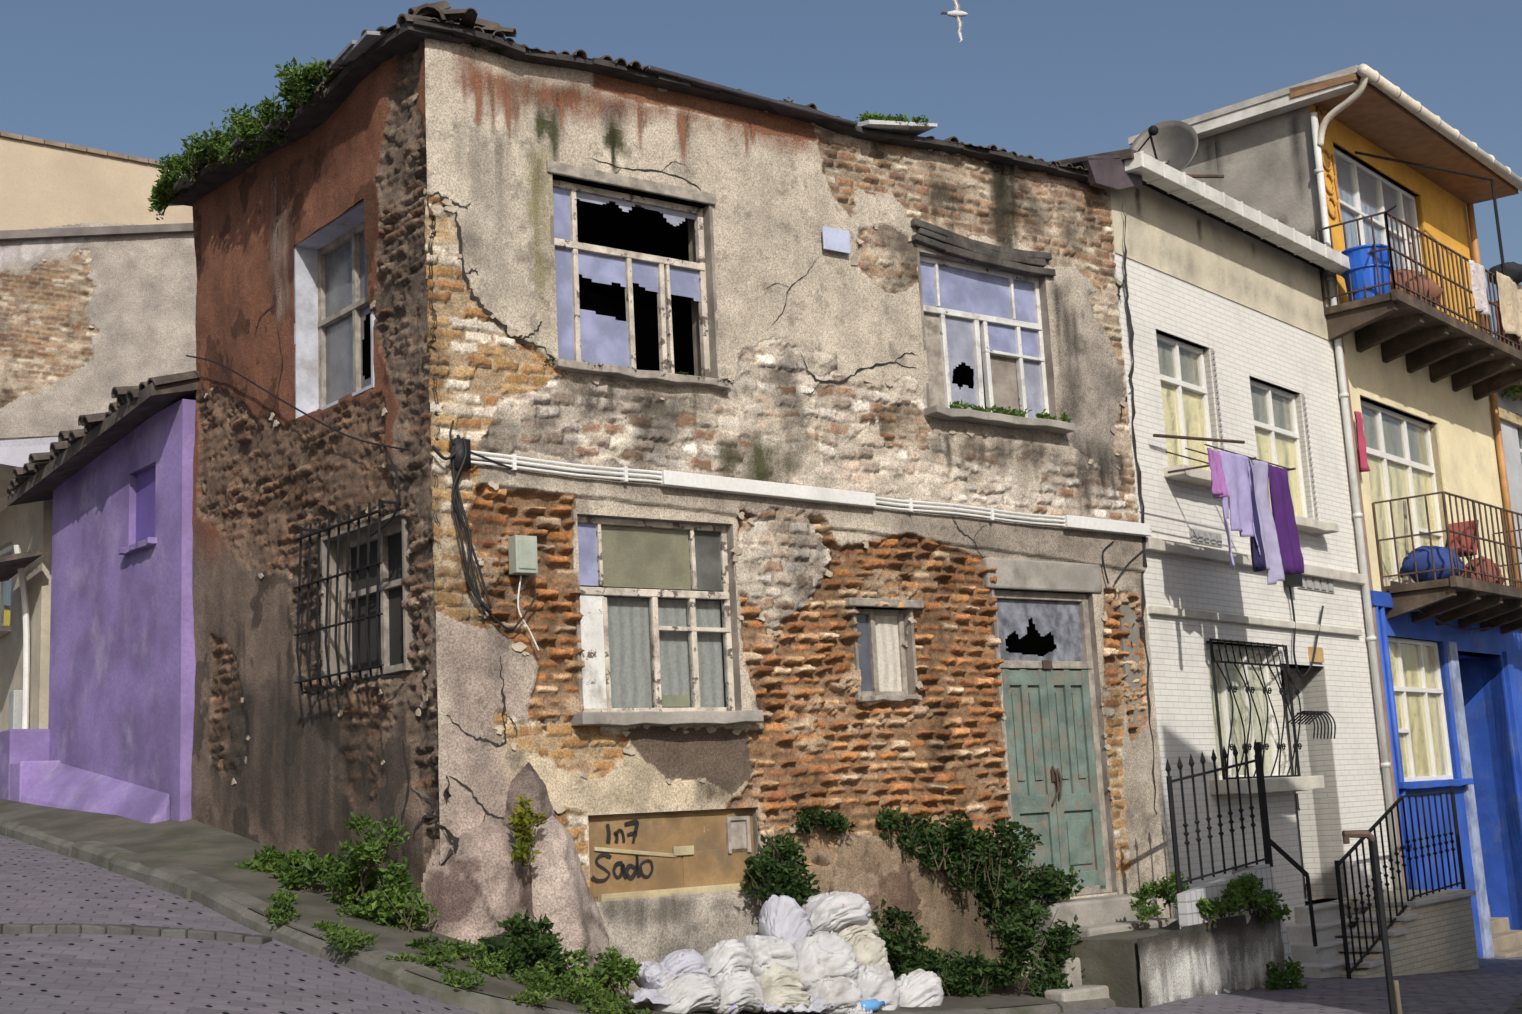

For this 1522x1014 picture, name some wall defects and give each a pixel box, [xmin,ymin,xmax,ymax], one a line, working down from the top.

rust [463,58,697,155]
water stain [604,123,624,169]
rust [725,121,807,147]
spalling [0,237,101,410]
crack [426,191,568,375]
crack [768,258,817,327]
crack [800,352,916,395]
spalling [196,43,1139,876]
crack [446,656,517,747]
spalling [1101,587,1149,881]
crack [400,740,504,878]
spalling [552,804,590,889]